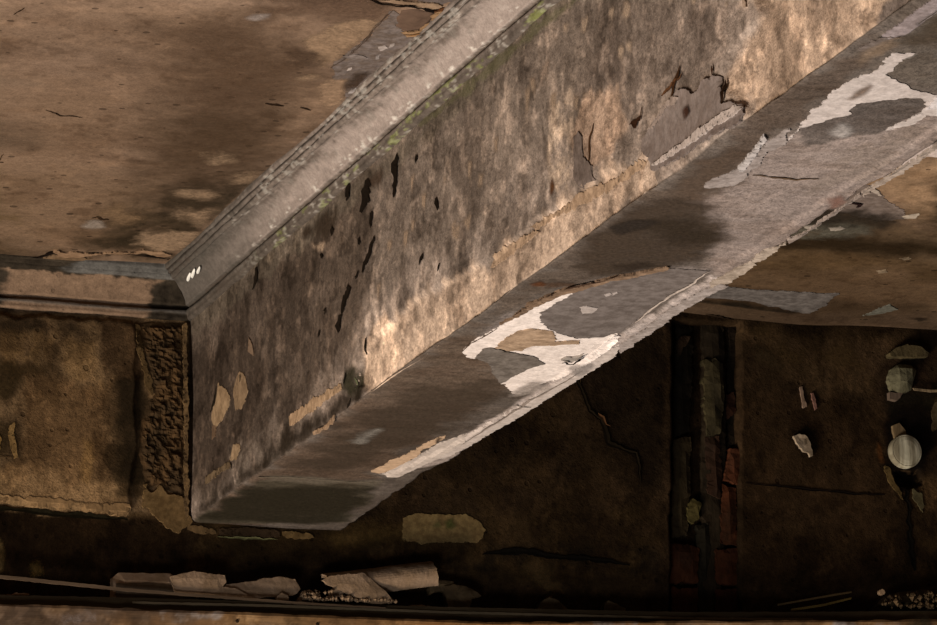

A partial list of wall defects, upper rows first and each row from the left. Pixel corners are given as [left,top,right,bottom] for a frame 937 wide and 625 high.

leakage [270,0,393,20]
peeling [297,10,414,107]
peeling [704,0,937,188]
leakage [100,132,253,249]
peeling [491,61,746,268]
leakage [576,152,744,275]
peeling [258,141,937,485]
spalling [0,322,314,540]
leakage [262,368,365,469]
leakage [309,382,506,469]
leakage [199,470,371,524]
spalling [332,513,485,545]